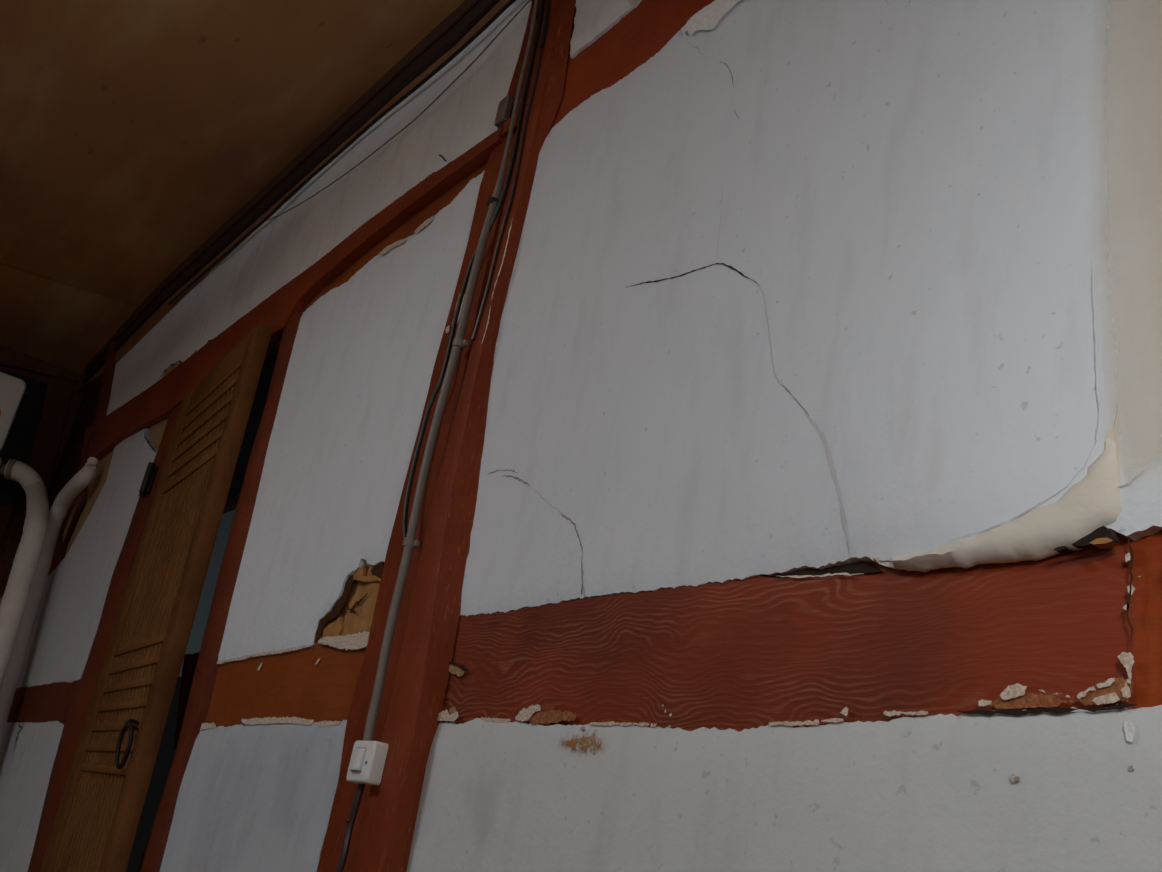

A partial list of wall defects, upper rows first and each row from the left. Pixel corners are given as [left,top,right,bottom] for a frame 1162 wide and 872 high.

flaking render [681,0,751,56]
crack [628,185,851,551]
crack [487,469,583,596]
flaking render [217,562,384,664]
flaking render [437,706,459,722]
flaking render [515,704,576,725]
peeling [957,652,1137,742]